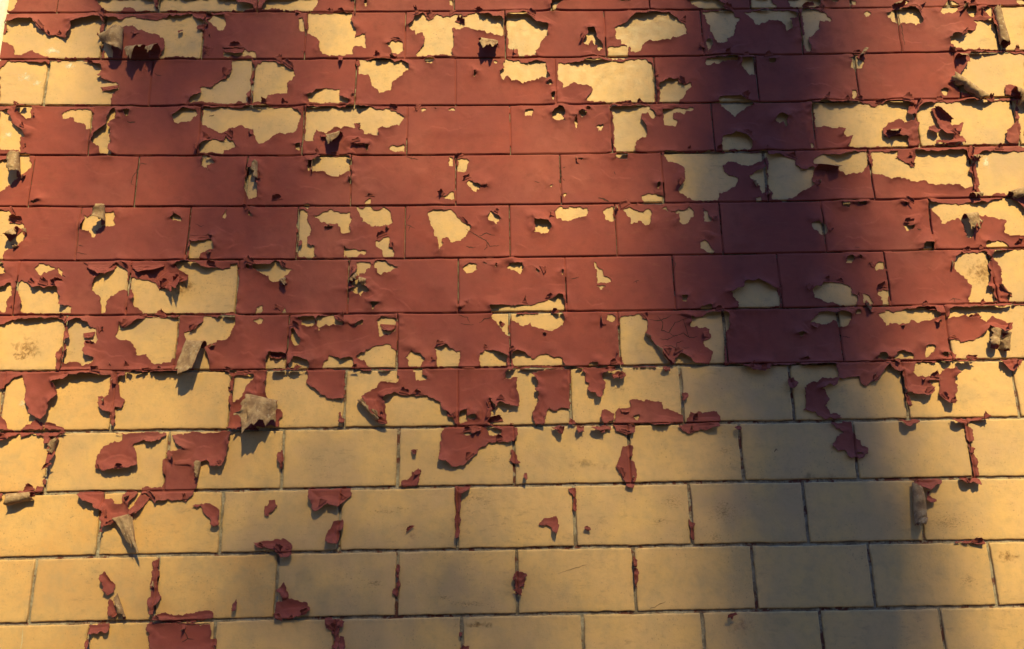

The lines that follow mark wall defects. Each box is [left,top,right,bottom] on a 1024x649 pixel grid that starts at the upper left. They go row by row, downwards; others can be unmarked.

peeling [0,0,837,192]
peeling [242,159,261,216]
peeling [603,0,1024,459]
peeling [0,189,721,554]
peeling [952,411,991,485]
peeling [912,478,942,525]
peeling [254,538,293,557]
peeling [84,571,126,649]
peeling [146,557,217,649]
peeling [273,582,310,621]